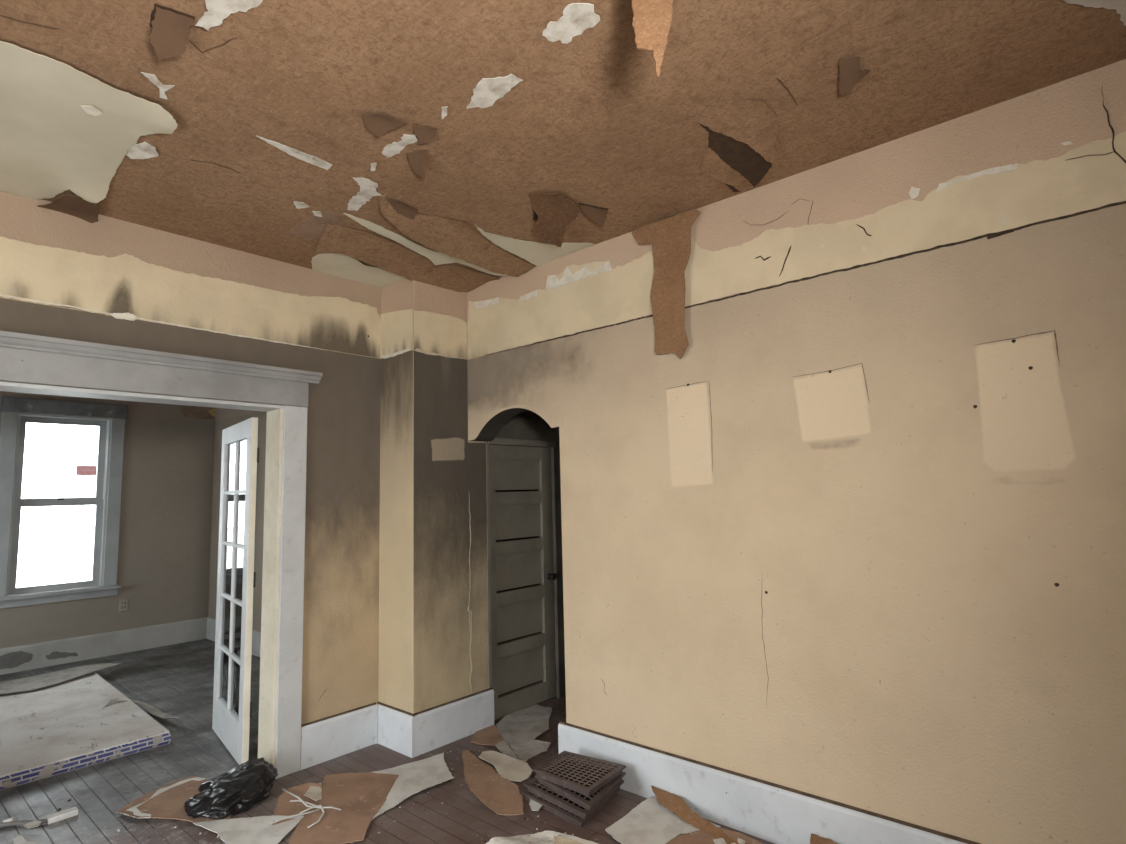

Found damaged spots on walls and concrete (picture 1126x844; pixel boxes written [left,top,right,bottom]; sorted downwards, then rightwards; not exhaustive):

flaking render [195,0,263,30]
flaking render [542,3,600,44]
flaking render [141,72,175,99]
flaking render [466,73,523,109]
crack [1065,83,1126,163]
flaking render [127,141,159,159]
flaking render [256,135,332,170]
flaking render [344,134,509,277]
peeling [684,131,1126,307]
crack [685,199,1126,309]
peeling [0,225,655,359]
crack [484,314,653,356]